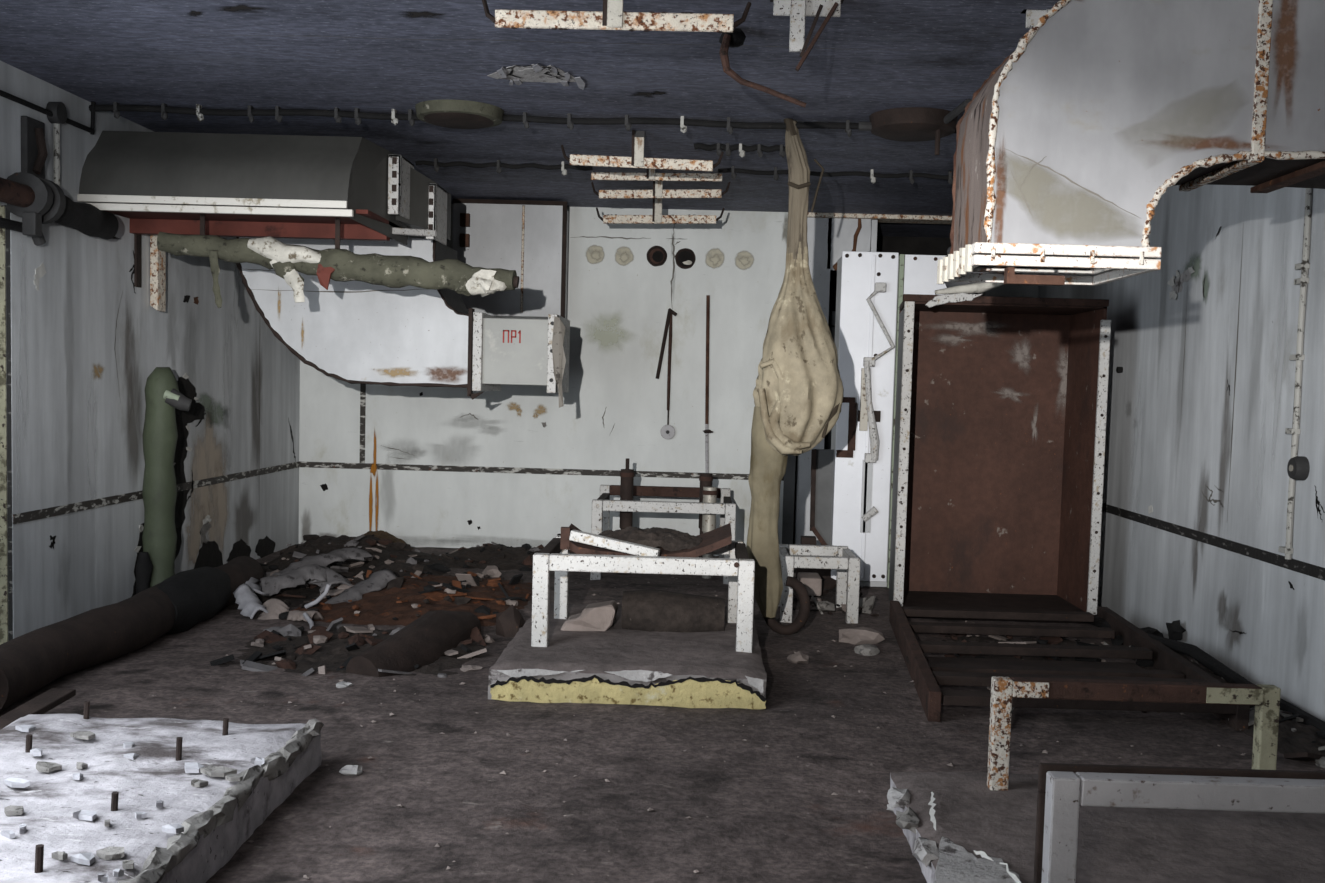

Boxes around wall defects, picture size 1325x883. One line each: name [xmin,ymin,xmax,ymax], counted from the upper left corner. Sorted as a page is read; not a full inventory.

corrosion [384,369,410,377]
corrosion [430,368,463,381]
corrosion [369,431,379,531]